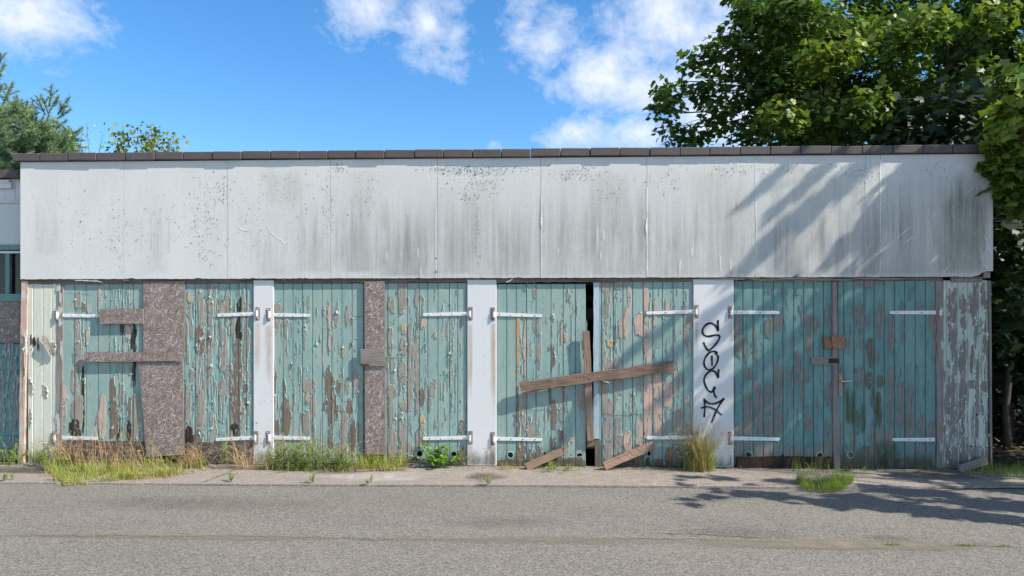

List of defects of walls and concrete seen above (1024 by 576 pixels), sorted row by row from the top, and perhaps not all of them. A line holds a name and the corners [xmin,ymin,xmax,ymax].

peeling [44,278,133,461]
peeling [96,324,141,441]
peeling [185,278,261,442]
peeling [274,296,365,462]
peeling [386,283,467,465]
peeling [497,288,587,466]
peeling [600,281,693,466]
peeling [734,275,990,468]